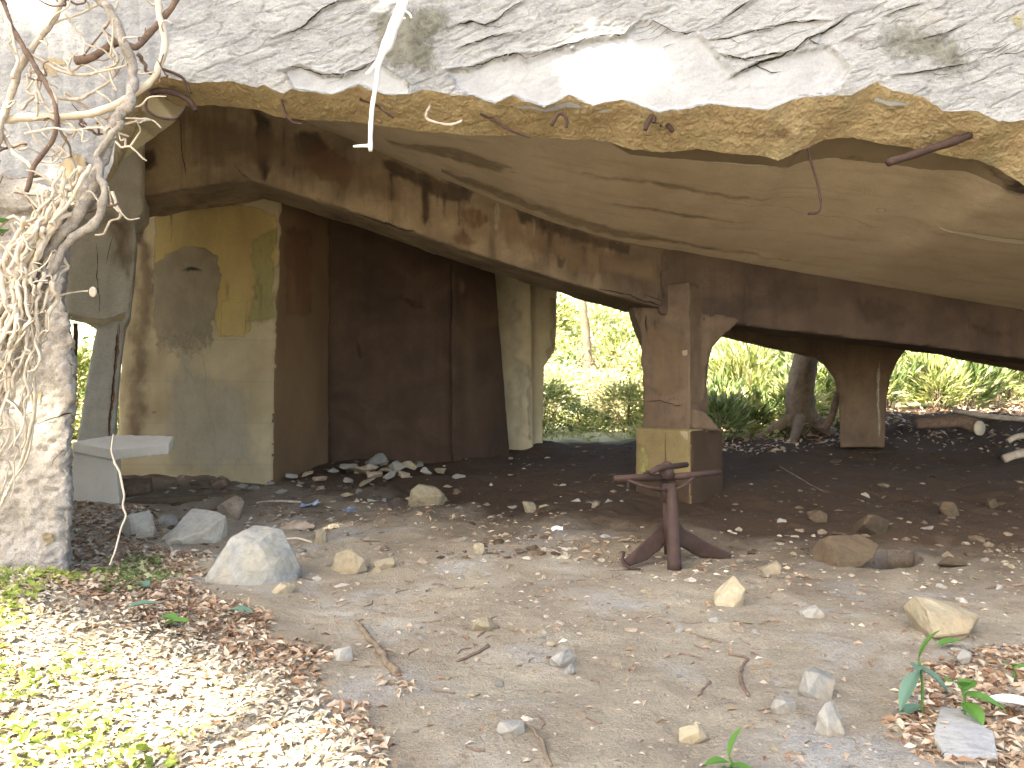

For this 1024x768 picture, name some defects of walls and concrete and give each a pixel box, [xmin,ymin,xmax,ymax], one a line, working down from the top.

crack [210,1,394,84]
crack [452,2,521,48]
crack [637,8,681,47]
crack [710,0,1024,82]
spalling [106,19,1024,215]
leakage [114,205,278,382]